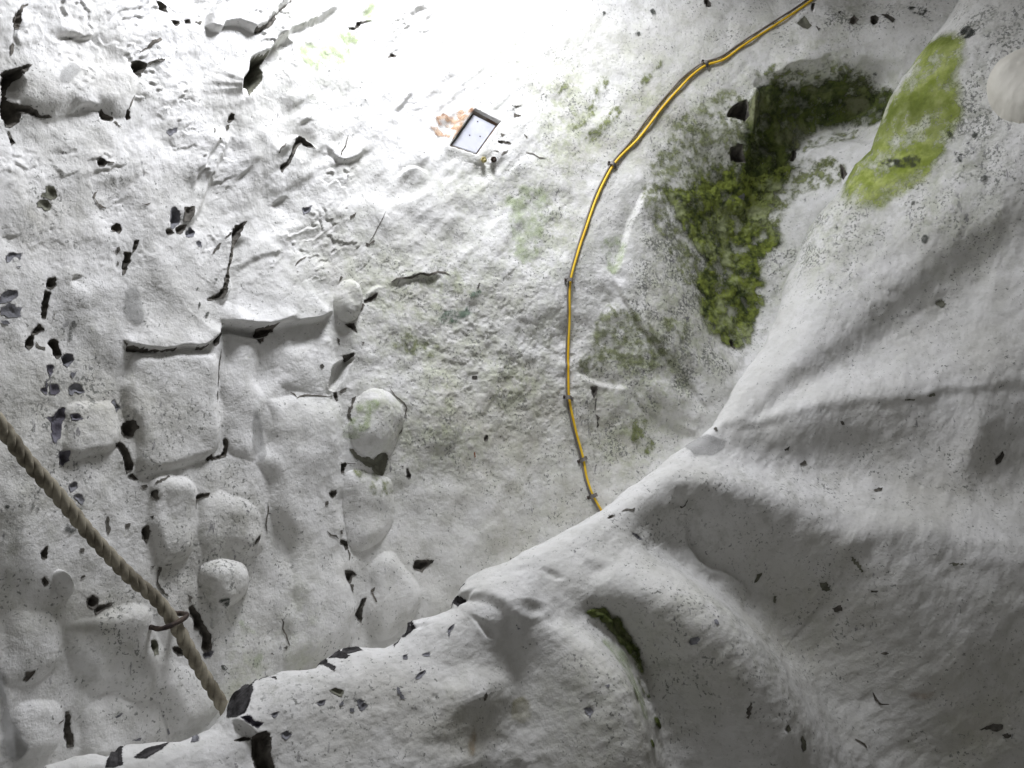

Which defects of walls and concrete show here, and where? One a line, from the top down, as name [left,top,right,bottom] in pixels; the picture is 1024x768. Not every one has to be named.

corrosion [431,107,474,138]
spalling [47,407,84,466]
spalling [226,676,277,717]